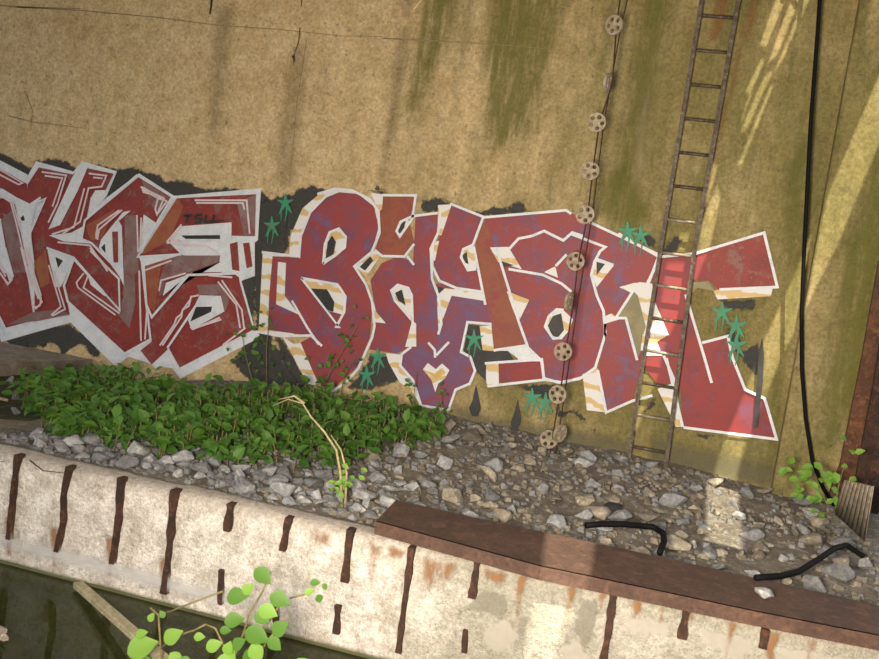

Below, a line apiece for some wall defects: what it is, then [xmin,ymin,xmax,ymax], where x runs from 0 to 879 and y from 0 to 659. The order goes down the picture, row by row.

crack [0,0,548,183]